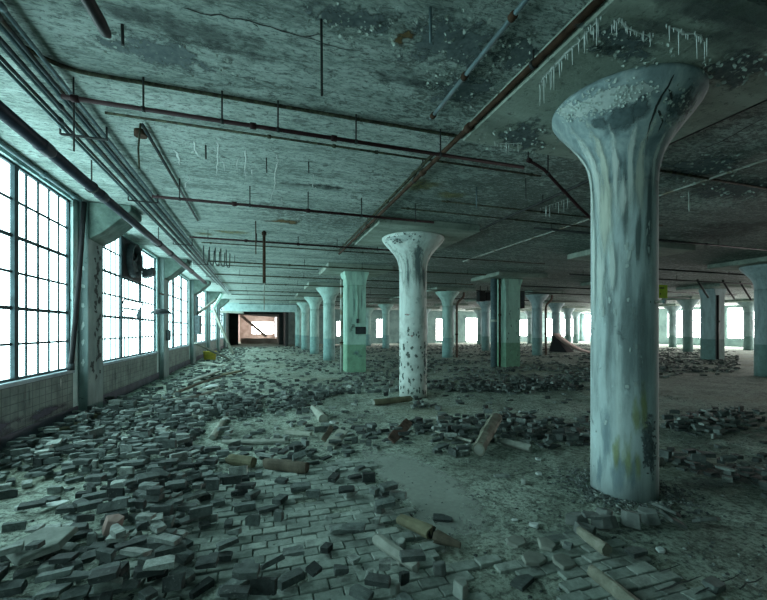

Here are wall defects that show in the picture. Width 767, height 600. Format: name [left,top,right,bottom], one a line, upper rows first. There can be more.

crack [181,7,358,51]
rust [394,30,415,46]
peeling [303,1,547,109]
peeling [477,119,562,155]
leakage [540,16,604,97]
crack [647,75,674,139]
peeling [556,23,767,130]
leakage [574,127,666,310]
peeling [399,291,427,395]
spalling [641,414,657,475]